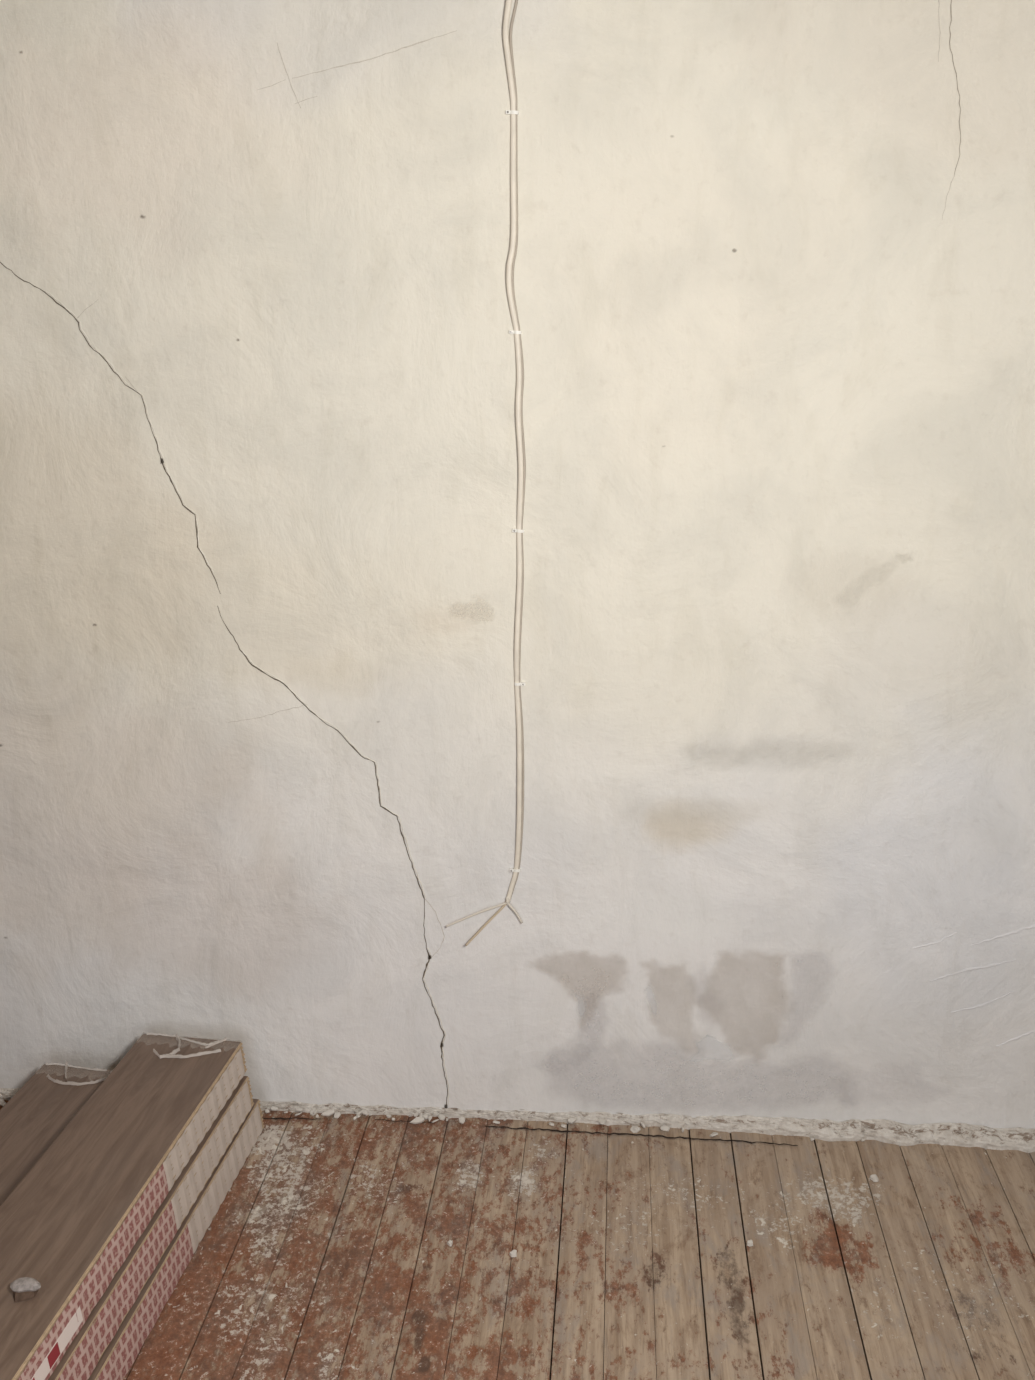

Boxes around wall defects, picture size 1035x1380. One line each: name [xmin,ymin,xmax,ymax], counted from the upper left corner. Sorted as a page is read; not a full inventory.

crack [938,0,961,218]
crack [0,262,449,1108]